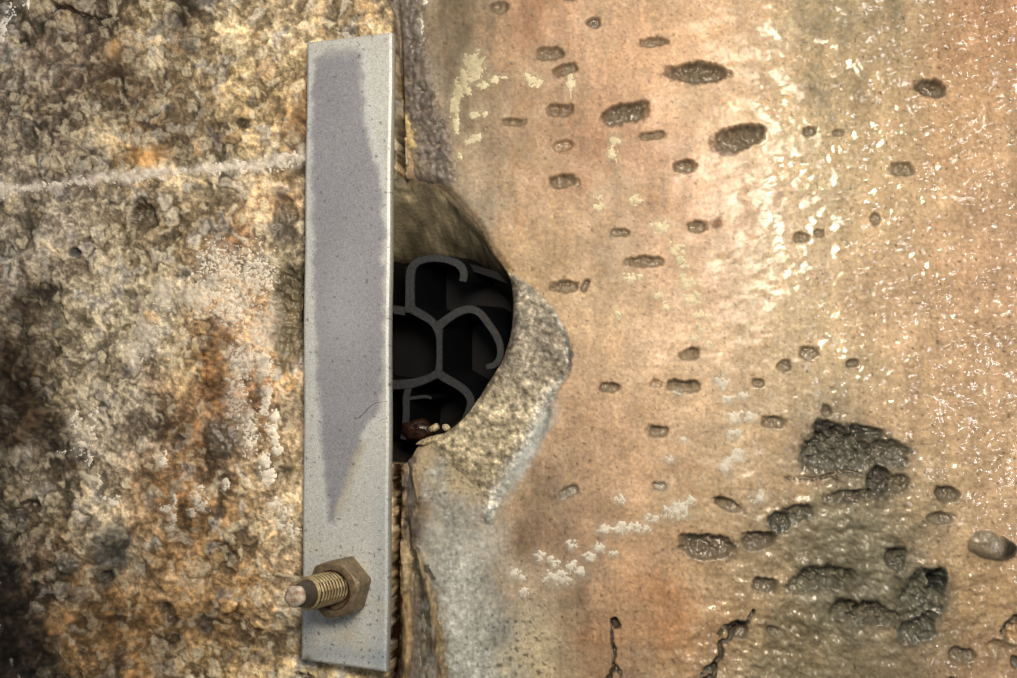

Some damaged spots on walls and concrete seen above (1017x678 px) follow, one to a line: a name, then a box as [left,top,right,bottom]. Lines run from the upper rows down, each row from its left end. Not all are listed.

water stain [447,49,507,159]
water stain [524,72,544,88]
water stain [565,73,576,99]
water stain [0,146,306,202]
spalling [549,280,590,293]
spalling [428,423,451,432]
water stain [533,494,696,586]
water stain [0,532,49,678]
water stain [510,568,529,597]
crack [606,626,622,678]
crack [701,610,755,678]
crack [1000,615,1017,634]